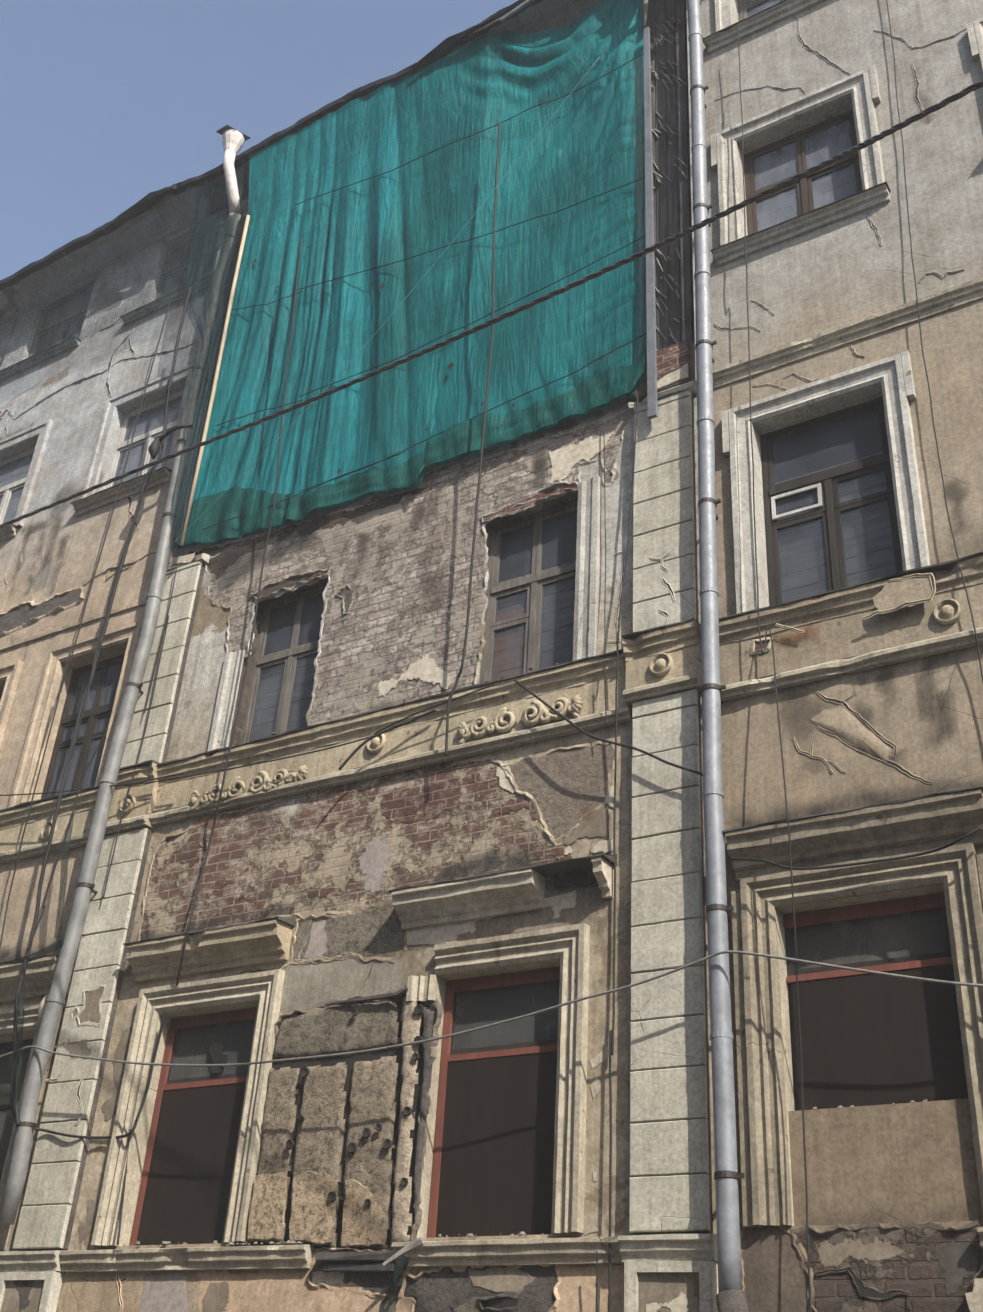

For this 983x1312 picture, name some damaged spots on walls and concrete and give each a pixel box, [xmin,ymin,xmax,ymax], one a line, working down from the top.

crack [714,85,807,130]
crack [792,15,852,76]
crack [873,24,974,112]
crack [0,318,196,435]
flaking render [168,406,634,726]
crack [792,680,934,785]
spalling [137,741,619,1312]
flaking render [740,1220,983,1312]